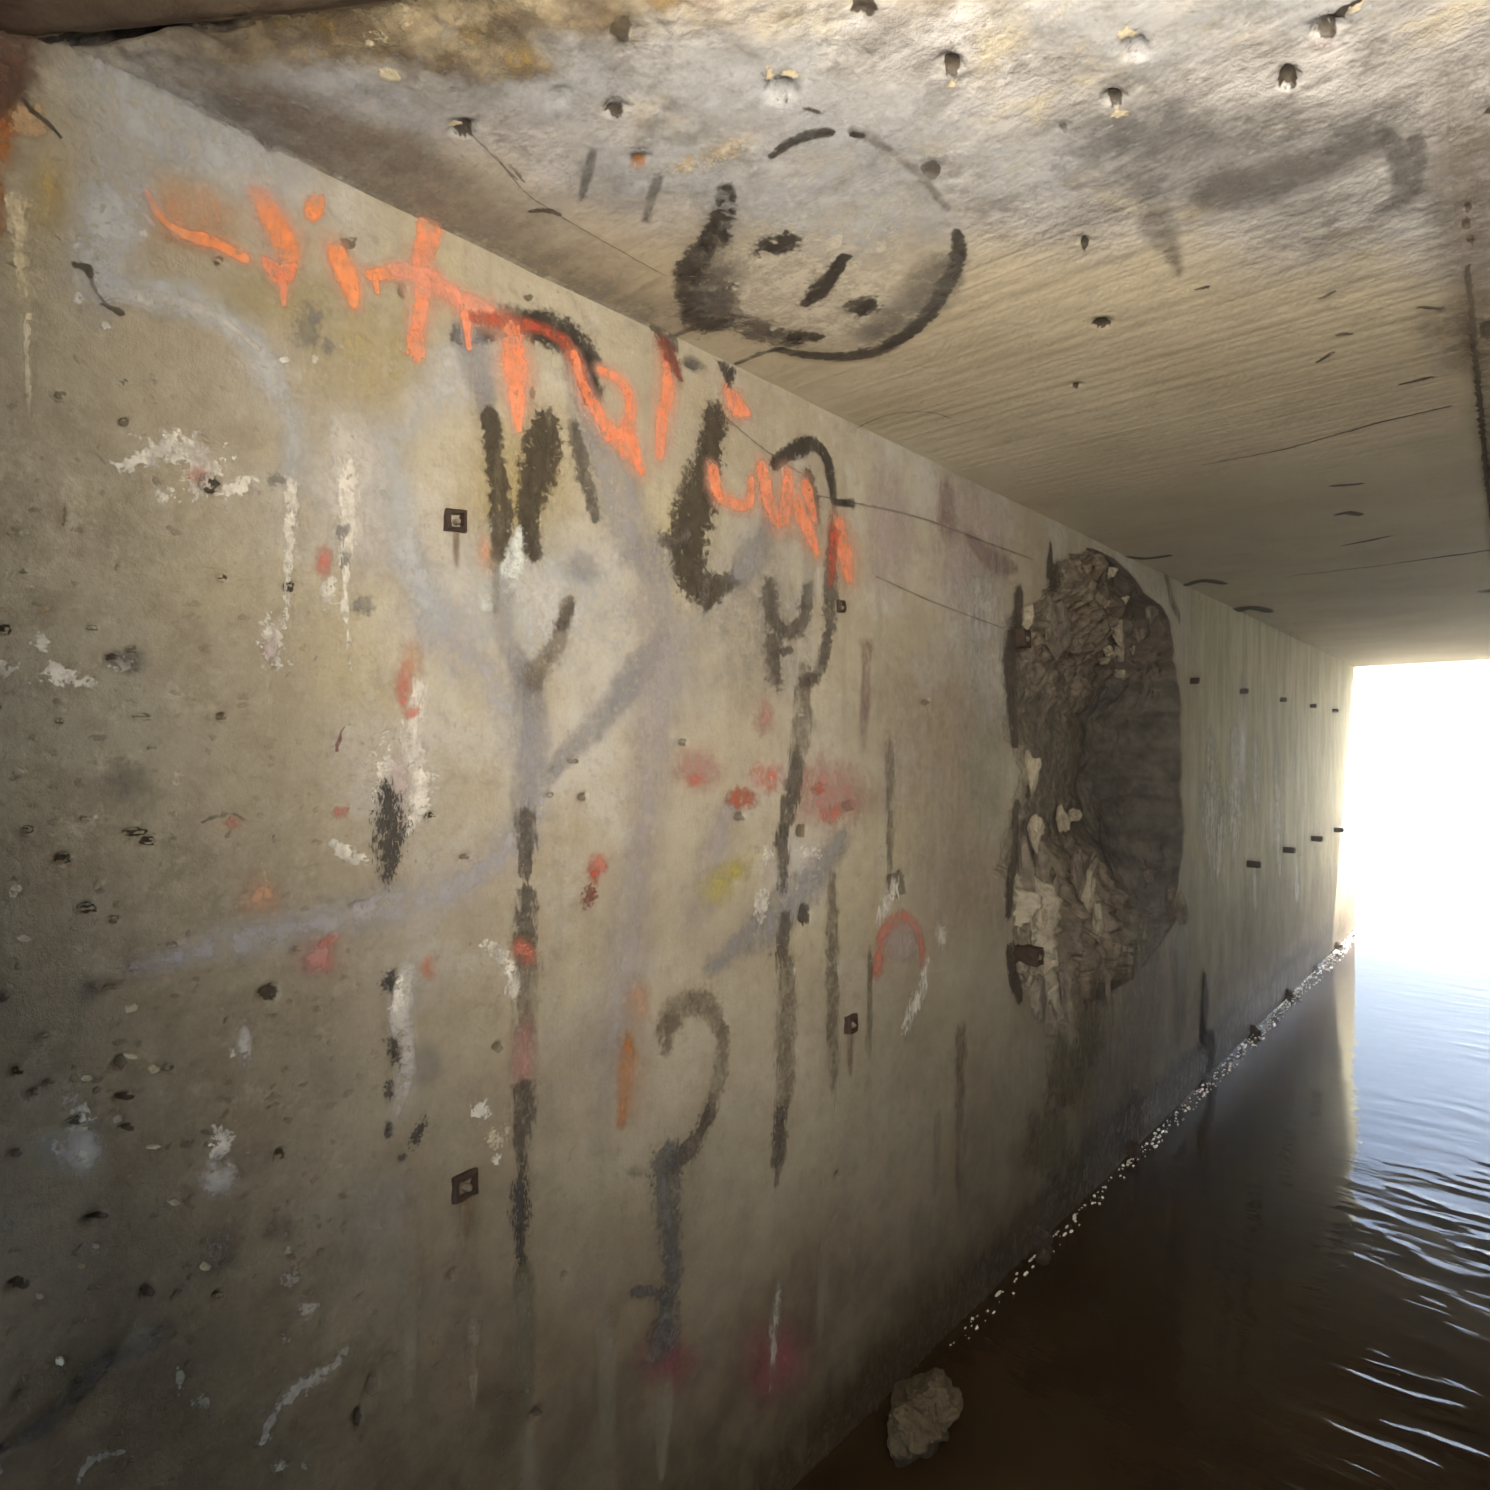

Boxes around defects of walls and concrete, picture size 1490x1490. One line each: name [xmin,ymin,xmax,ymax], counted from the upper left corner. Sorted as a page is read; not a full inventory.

rust [0,29,47,154]
crack [1201,264,1490,575]
crack [1125,555,1276,617]
spalling [990,546,1189,1037]